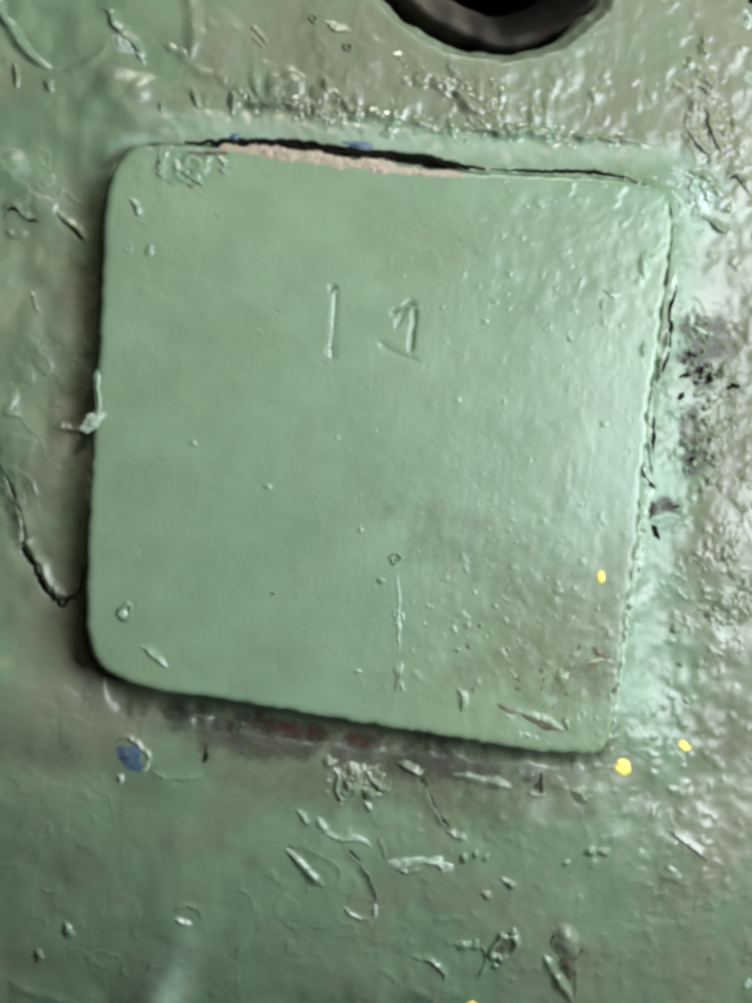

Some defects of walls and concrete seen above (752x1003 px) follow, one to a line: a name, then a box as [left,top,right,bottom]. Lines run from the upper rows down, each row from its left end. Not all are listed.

spalling [308,14,354,52]
spalling [151,133,466,188]
spalling [128,196,146,217]
crack [21,532,85,608]
peeling [526,790,548,798]
peeling [569,785,592,805]
peeling [284,808,490,920]
peeling [499,876,518,890]
peeling [582,846,611,857]
spalling [484,927,522,970]
peeling [541,922,583,1003]